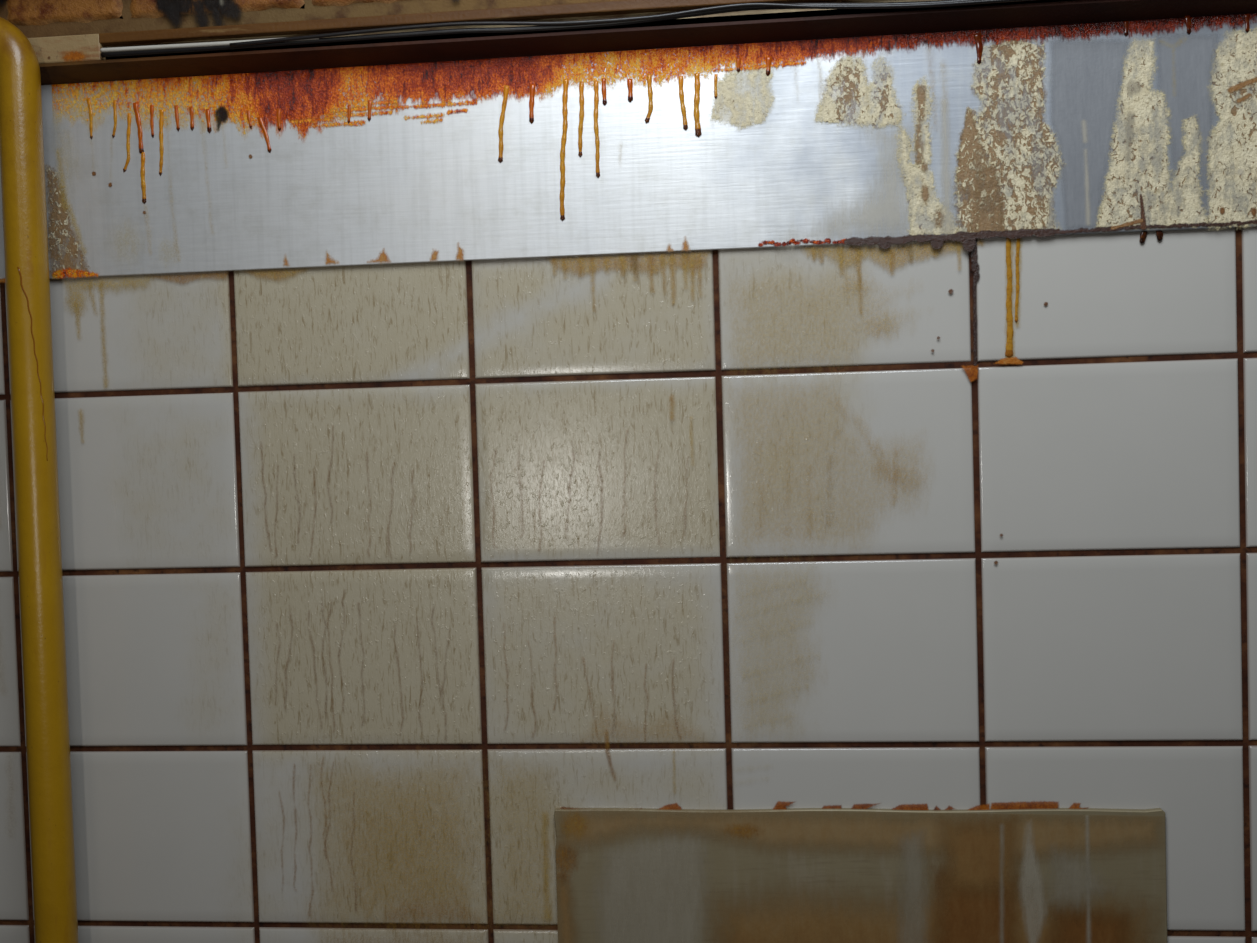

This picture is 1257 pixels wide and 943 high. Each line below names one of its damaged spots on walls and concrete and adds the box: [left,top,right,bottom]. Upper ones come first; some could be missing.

corrosion [46,168,98,279]
corrosion [48,13,1257,221]
peeling [712,68,774,129]
peeling [816,40,1061,236]
corrosion [758,194,1257,382]
peeling [1096,28,1257,228]